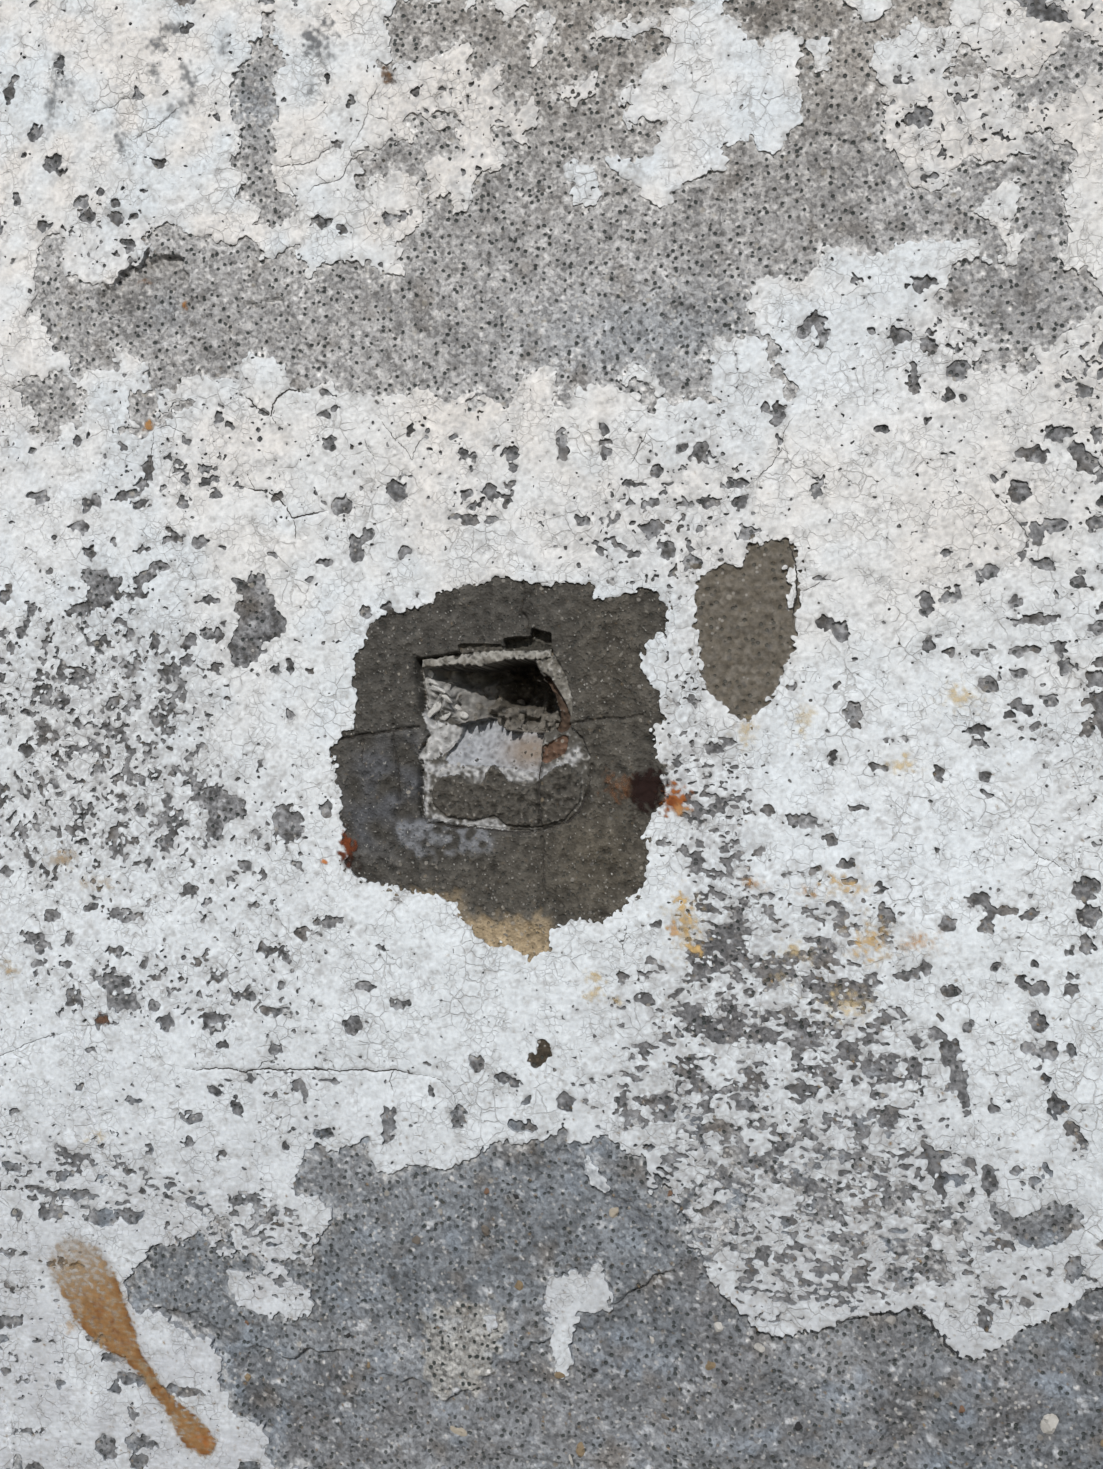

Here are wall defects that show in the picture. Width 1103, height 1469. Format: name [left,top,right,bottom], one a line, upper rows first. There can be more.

peeling [3,75,20,105]
peeling [13,0,1103,447]
corrosion [322,832,357,869]
spalling [0,423,1103,1469]
corrosion [608,768,693,817]
corrosion [50,1243,216,1456]